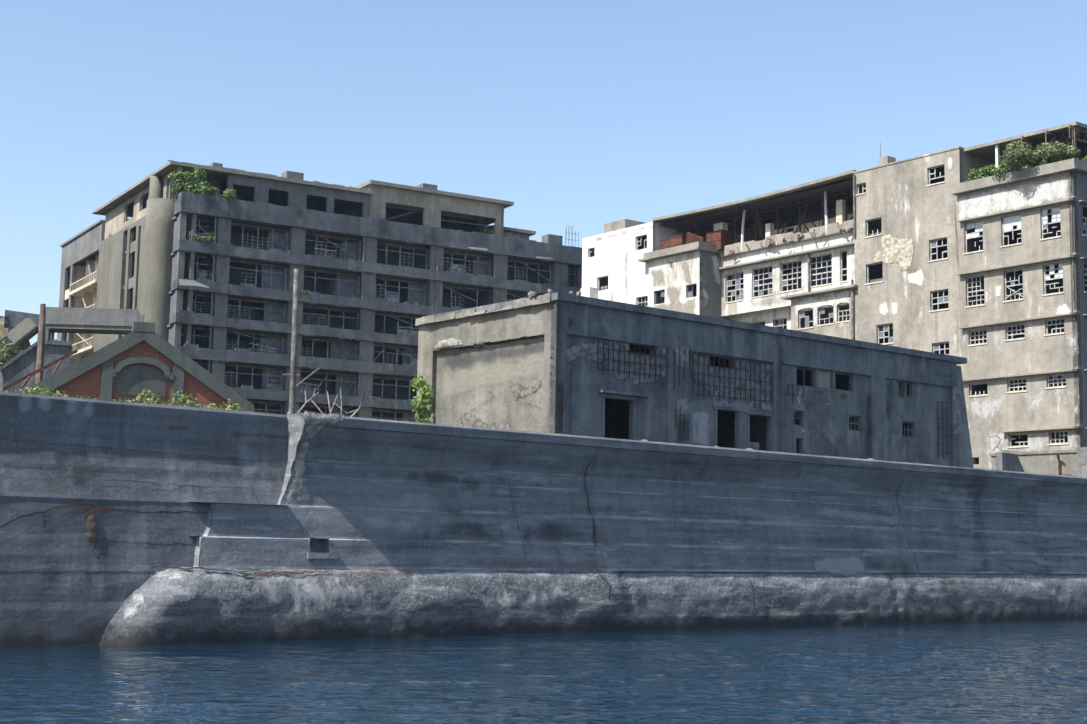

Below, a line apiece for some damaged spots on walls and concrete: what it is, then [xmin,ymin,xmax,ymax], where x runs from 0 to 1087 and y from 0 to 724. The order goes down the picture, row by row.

peeling [873,234,924,286]
crack [0,439,289,529]
crack [0,540,328,578]
crack [584,442,613,630]
water stain [291,579,364,610]